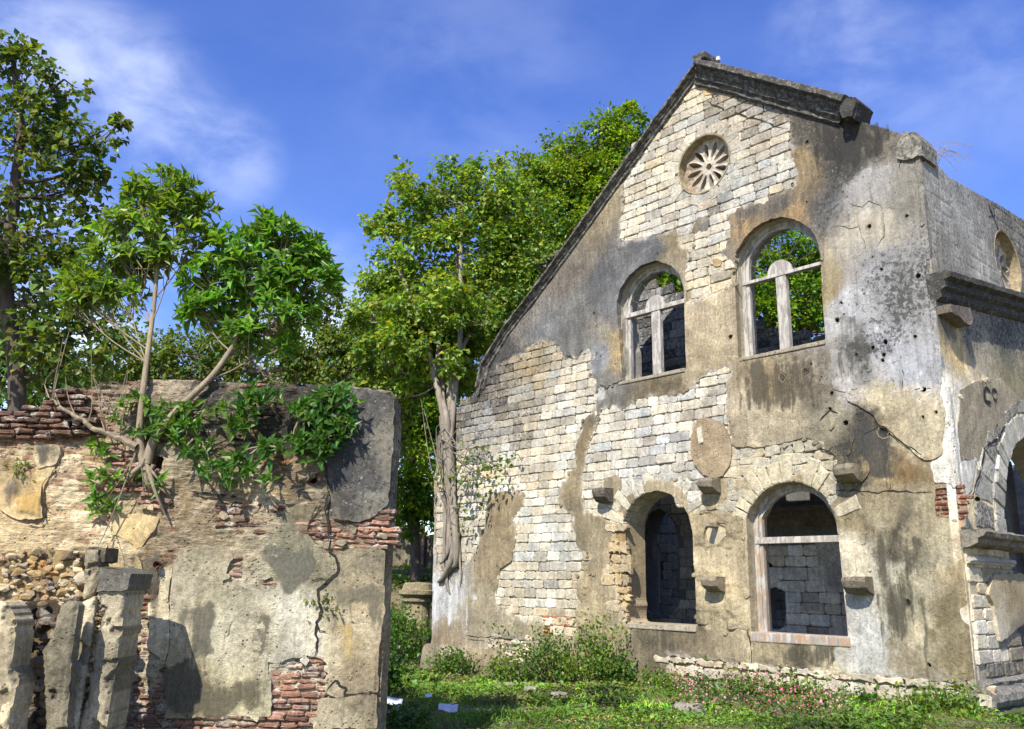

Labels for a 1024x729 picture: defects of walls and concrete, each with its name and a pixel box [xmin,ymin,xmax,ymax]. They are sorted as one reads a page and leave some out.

water stain [815,123,889,173]
spalling [619,84,804,304]
peeling [820,158,1021,527]
spalling [0,387,103,441]
water stain [740,356,813,411]
crack [863,413,921,455]
crack [307,409,340,657]
spalling [289,471,403,550]
spalling [433,340,872,669]
spalling [126,583,334,729]
crack [326,680,379,696]